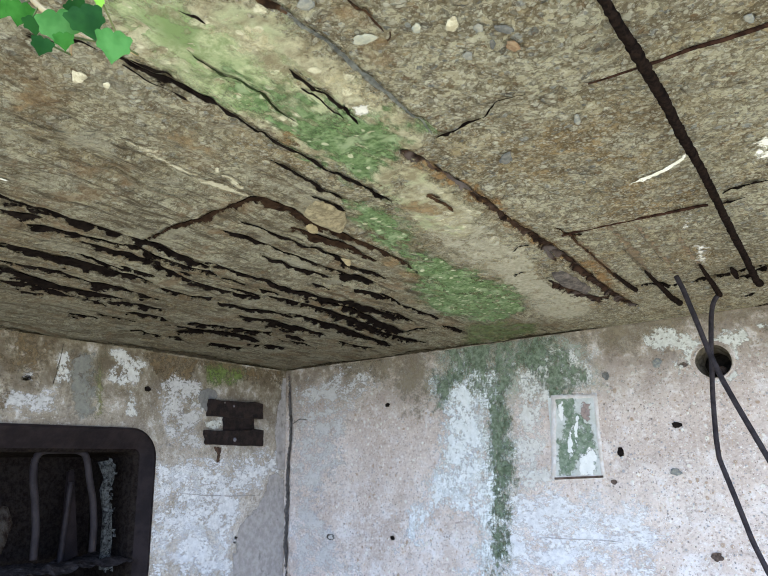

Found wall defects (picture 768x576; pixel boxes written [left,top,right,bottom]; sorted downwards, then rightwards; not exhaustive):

crack [119,50,392,211]
damp [319,72,376,116]
crack [434,94,525,139]
crack [65,156,193,207]
damp [126,141,248,196]
damp [422,187,590,318]
damp [704,308,759,360]
damp [0,351,97,419]
crack [0,194,597,576]
damp [108,349,283,576]
damp [289,318,701,576]